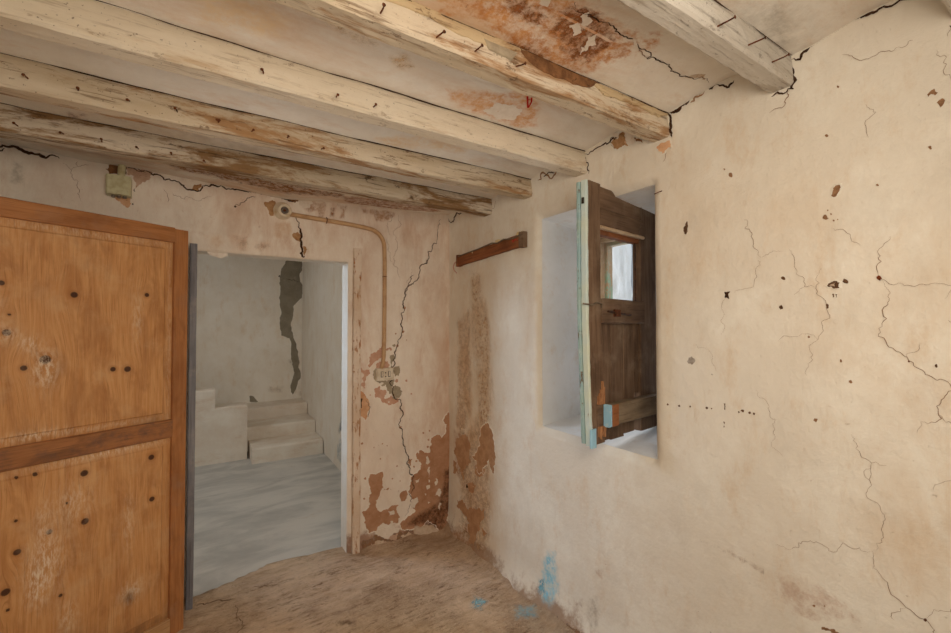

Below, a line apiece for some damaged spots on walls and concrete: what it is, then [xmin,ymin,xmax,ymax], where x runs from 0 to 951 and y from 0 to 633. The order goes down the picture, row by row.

crack [2,0,616,185]
water stain [437,80,548,132]
flaking render [609,131,642,151]
crack [714,0,824,111]
crack [858,0,902,19]
crack [0,103,496,516]
crack [721,223,830,374]
crack [834,229,951,431]
flaking render [361,411,497,564]
water stain [764,561,874,633]
crack [777,438,951,633]